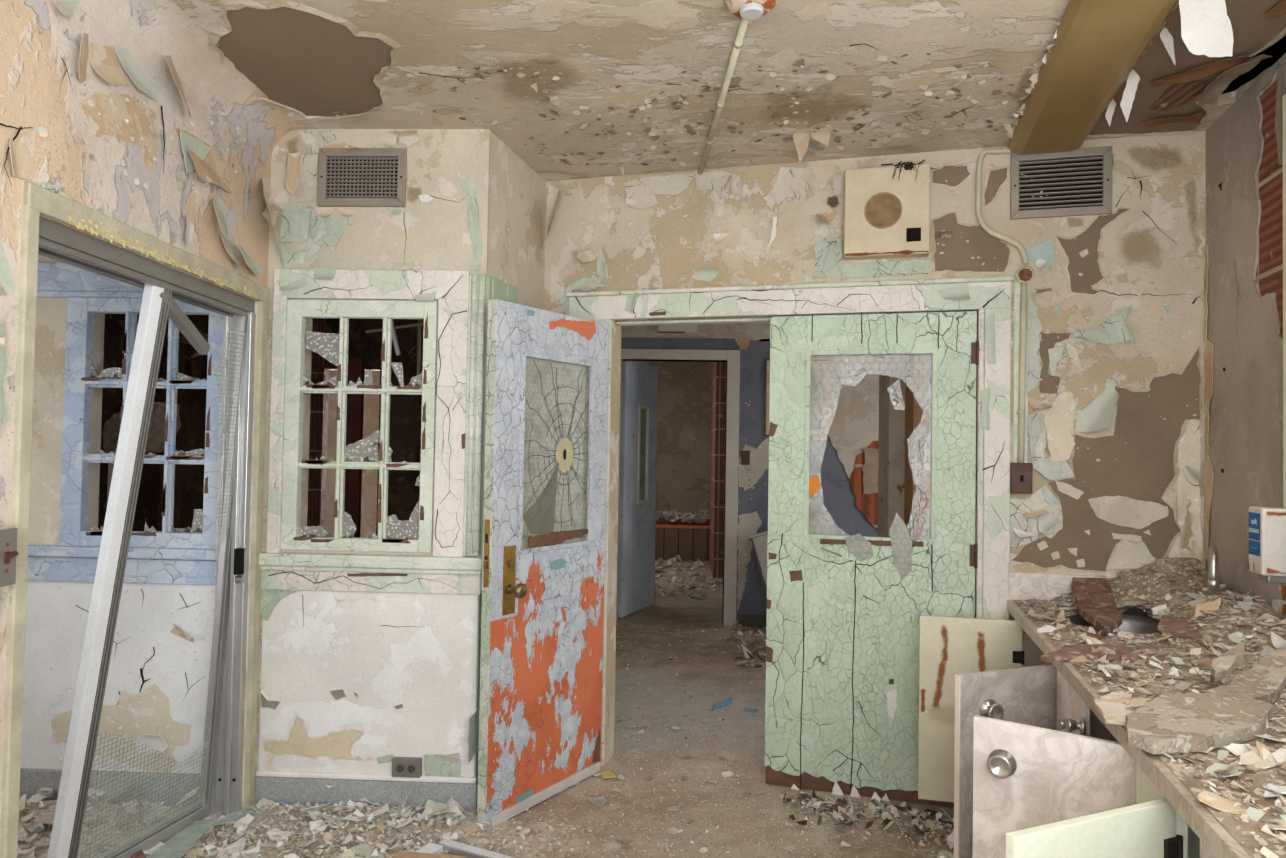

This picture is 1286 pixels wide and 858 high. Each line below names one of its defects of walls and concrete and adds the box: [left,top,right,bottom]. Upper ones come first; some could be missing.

peeling [63,33,264,276]
spalling [1087,0,1286,341]
spalling [207,0,1213,573]
crack [633,292,907,412]
peeling [36,688,73,760]
crack [113,637,155,706]
peeling [95,590,215,773]
peeling [259,688,410,737]
crack [522,361,589,539]
peeling [737,437,769,612]
crack [772,421,933,795]
corrosion [921,627,947,712]